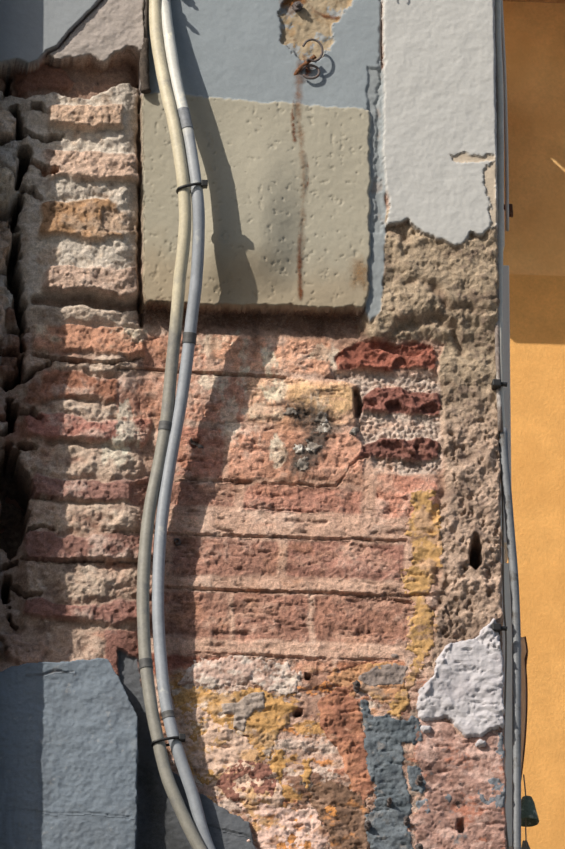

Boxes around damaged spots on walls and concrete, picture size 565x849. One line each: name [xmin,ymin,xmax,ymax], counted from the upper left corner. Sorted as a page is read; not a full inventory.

spalling [0,0,169,676]
crack [0,0,288,631]
spalling [149,502,180,776]
crack [102,529,408,543]
crack [179,453,371,514]
crack [164,585,437,605]
water stain [282,401,335,474]
spalling [164,151,507,849]